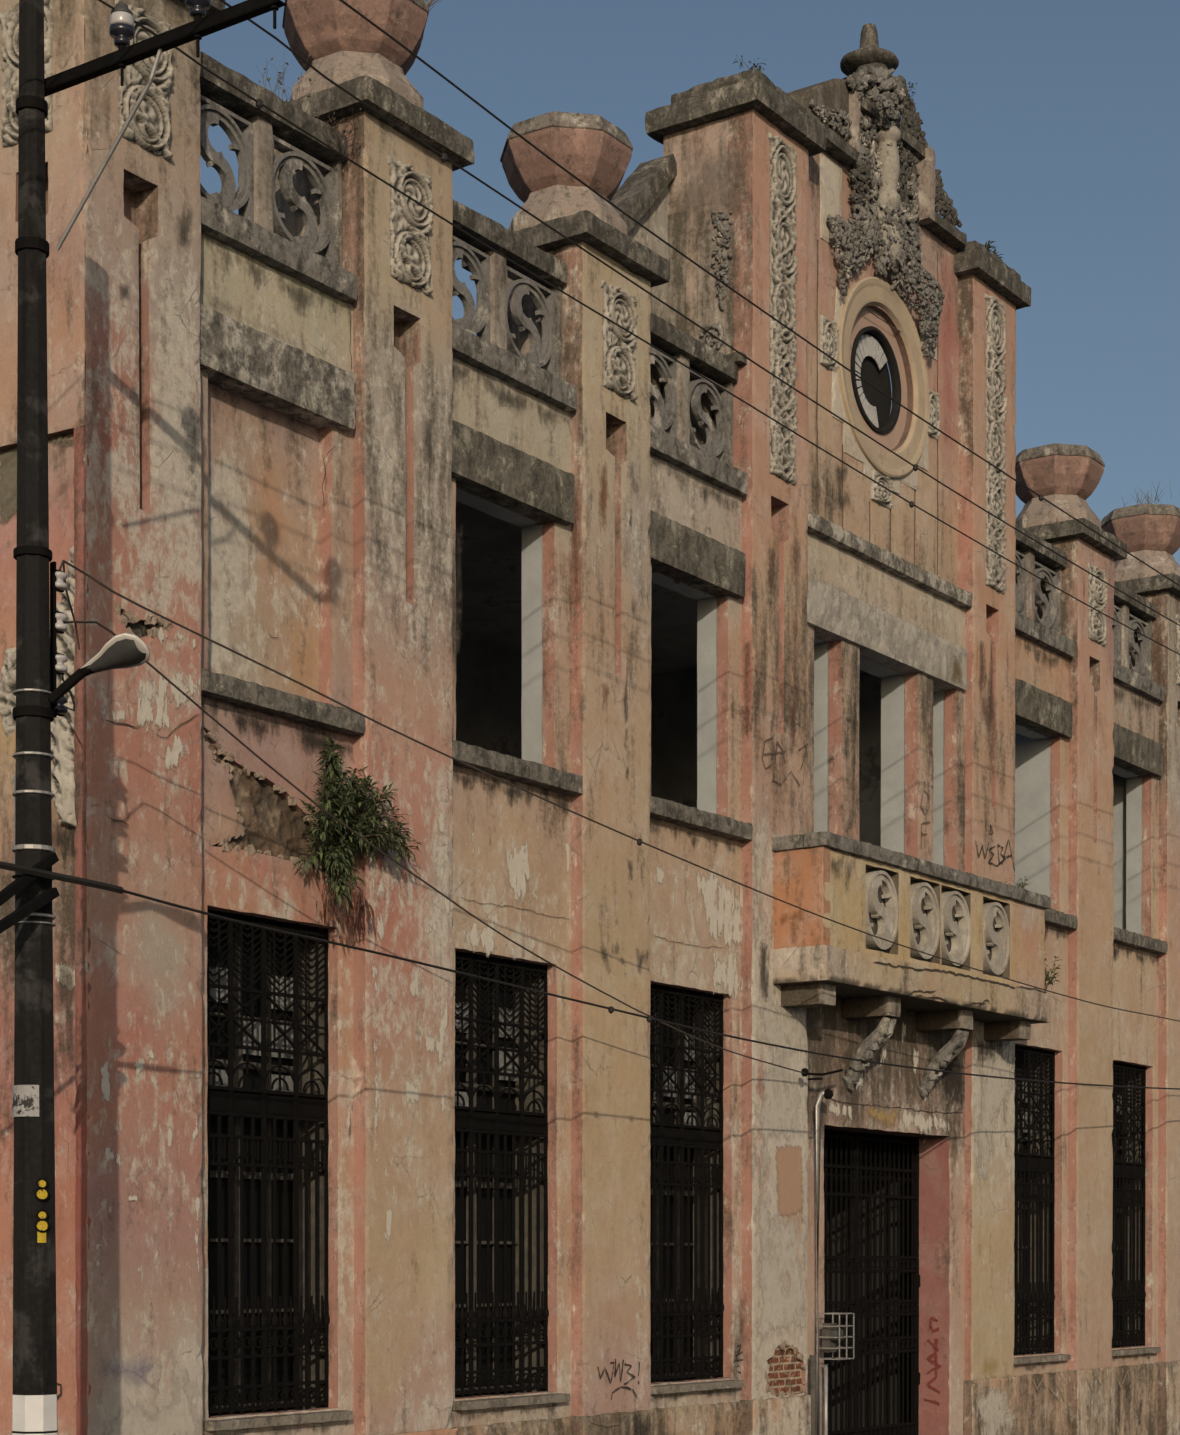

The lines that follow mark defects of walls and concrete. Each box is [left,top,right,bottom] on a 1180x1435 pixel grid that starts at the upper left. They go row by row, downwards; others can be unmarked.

spalling [114,601,196,649]
spalling [92,667,347,884]
peeling [372,874,387,940]
peeling [463,913,536,958]
peeling [506,841,543,905]
peeling [650,810,767,1000]
peeling [425,981,450,1064]
peeling [100,1061,110,1102]
peeling [754,1004,807,1398]